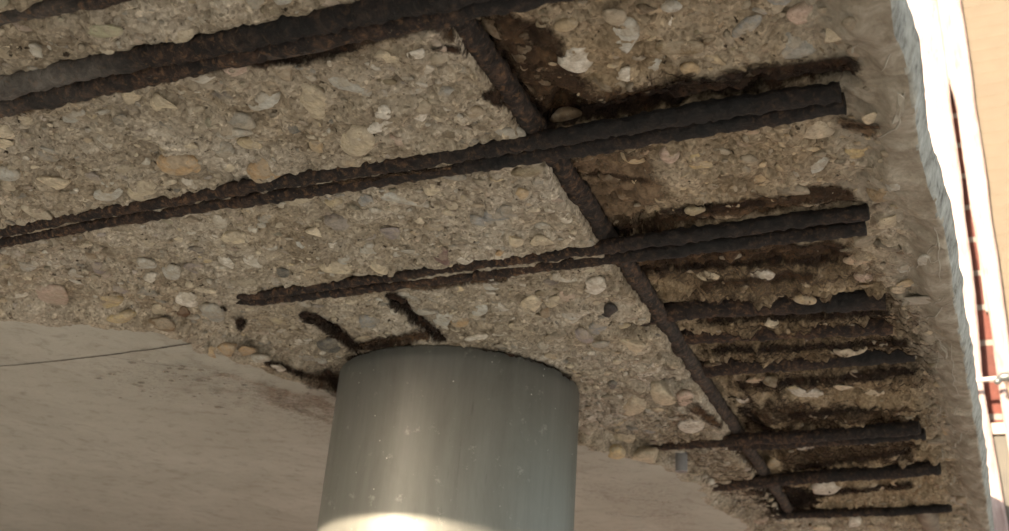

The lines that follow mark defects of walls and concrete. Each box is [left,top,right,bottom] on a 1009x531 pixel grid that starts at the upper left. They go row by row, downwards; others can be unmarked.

spalling [0,27,526,229]
rust [251,27,469,69]
spalling [452,16,548,134]
spalling [546,107,582,129]
rust [482,13,694,122]
rust [837,118,881,138]
rust [570,149,856,237]
crack [4,342,192,367]
spalling [0,159,923,531]
rust [660,245,934,433]
rust [658,399,723,443]
rust [689,448,912,530]